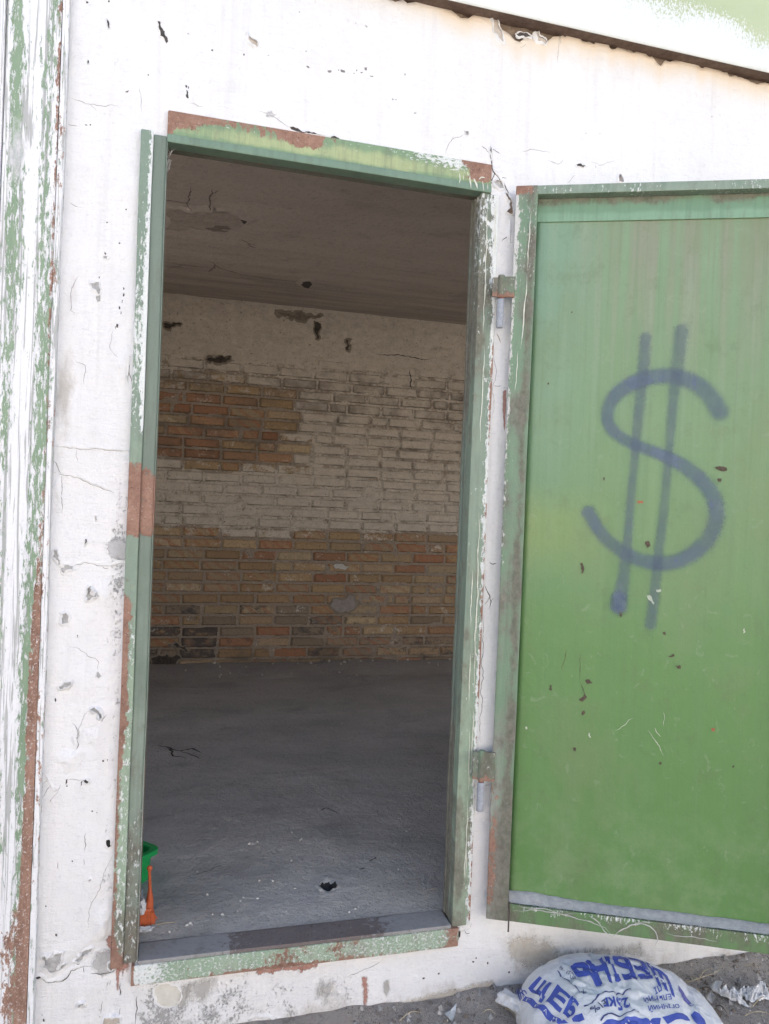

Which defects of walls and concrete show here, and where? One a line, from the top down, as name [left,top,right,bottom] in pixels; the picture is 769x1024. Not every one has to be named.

spalling [490,18,547,46]
spalling [288,125,340,139]
crack [445,134,513,205]
crack [167,188,217,212]
crack [54,442,130,509]
crack [159,745,201,759]
peeling [36,945,96,981]